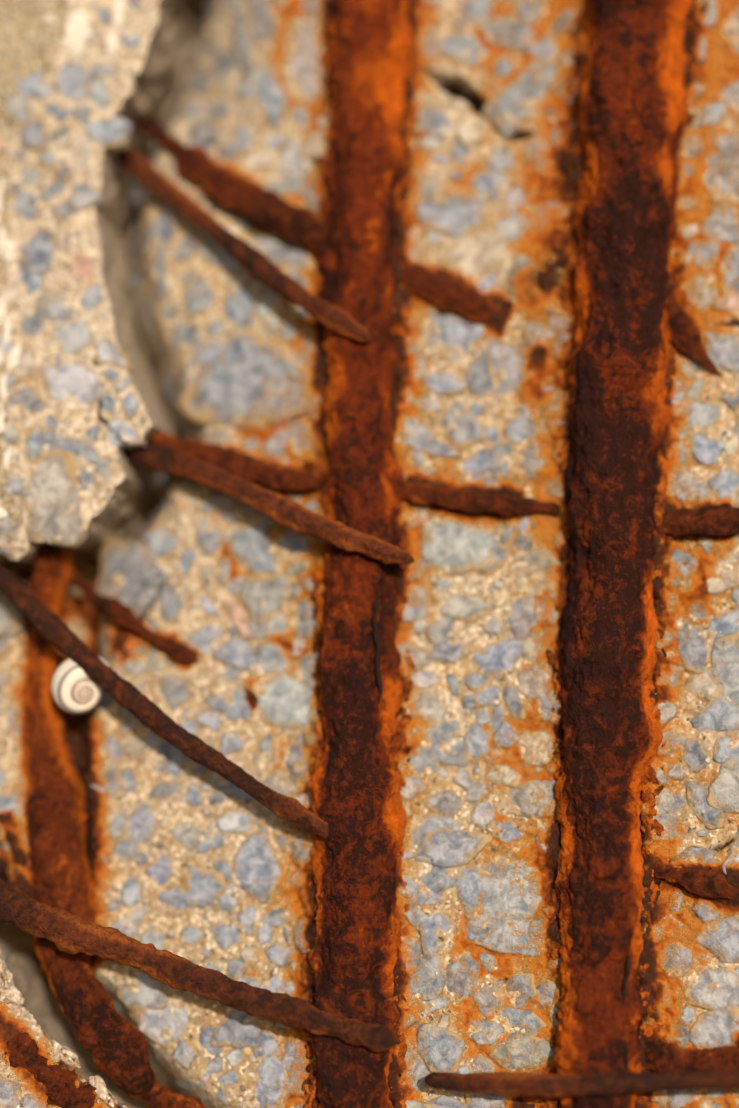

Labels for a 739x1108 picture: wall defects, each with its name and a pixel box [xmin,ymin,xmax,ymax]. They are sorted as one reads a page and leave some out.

peeling [61,10,93,59]
rust [666,0,739,347]
rust [196,295,330,517]
spalling [396,300,571,498]
rust [388,0,589,1108]
rust [62,703,119,927]
spalling [91,689,313,997]
rust [638,340,739,1074]
rust [0,1001,62,1108]
spalling [0,921,147,1108]
spalling [78,953,396,1108]
spalling [659,891,739,1049]